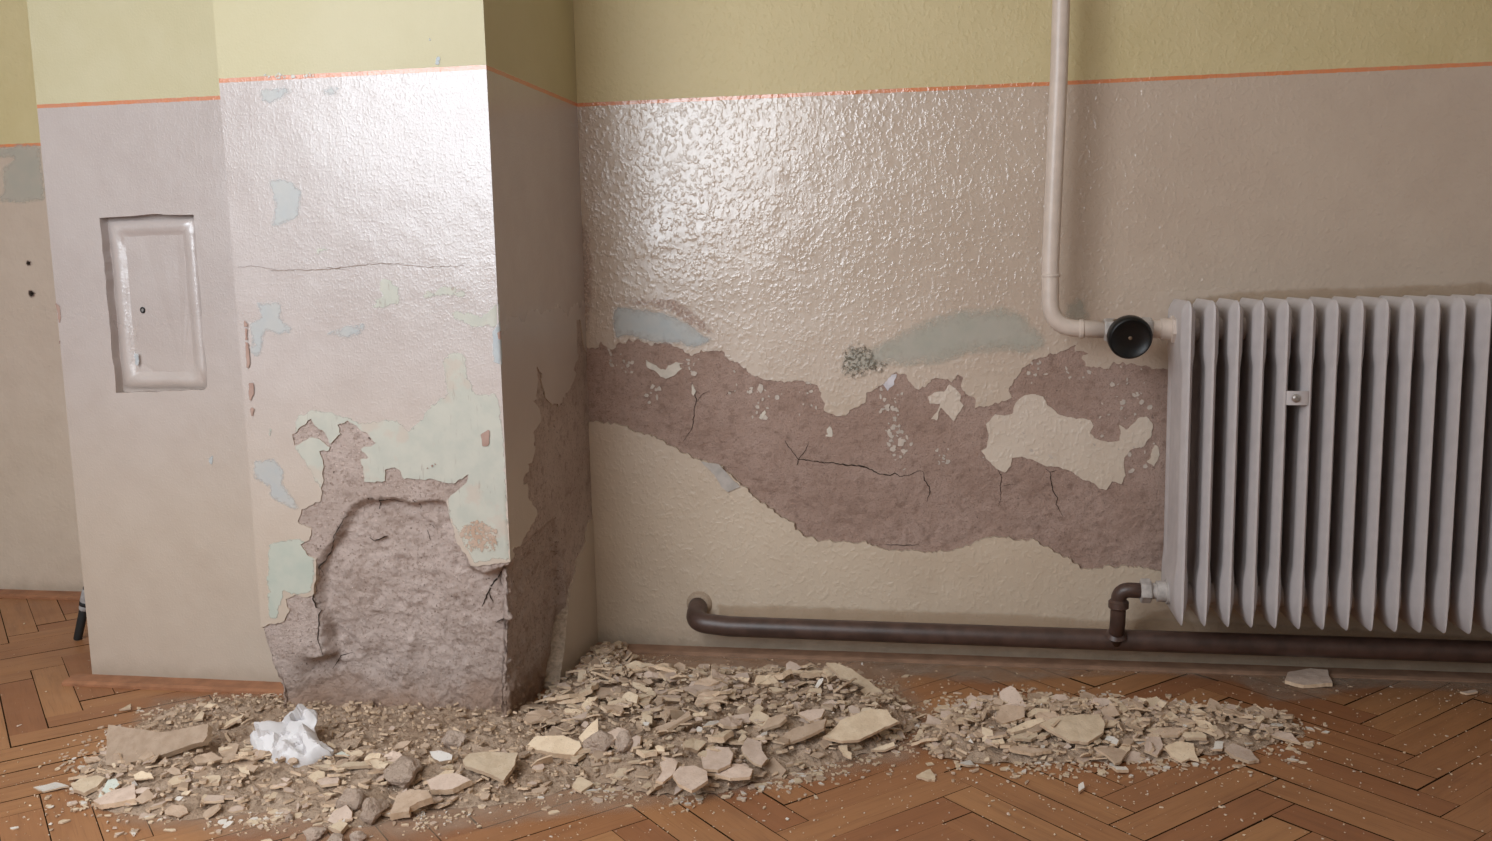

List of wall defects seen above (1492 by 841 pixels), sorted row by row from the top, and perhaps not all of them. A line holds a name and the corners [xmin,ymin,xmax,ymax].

peeling [0,145,43,201]
peeling [452,304,502,364]
peeling [244,321,254,416]
crack [785,441,930,500]
spalling [254,320,1168,718]